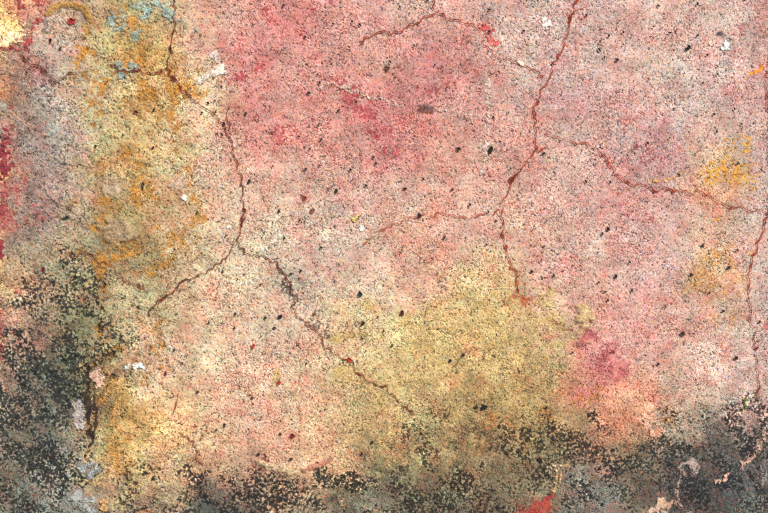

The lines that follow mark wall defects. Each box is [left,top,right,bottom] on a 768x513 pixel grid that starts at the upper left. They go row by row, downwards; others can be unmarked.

leakage [0,240,145,513]
crack [65,0,433,451]
leakage [114,260,768,513]
crack [360,0,768,399]